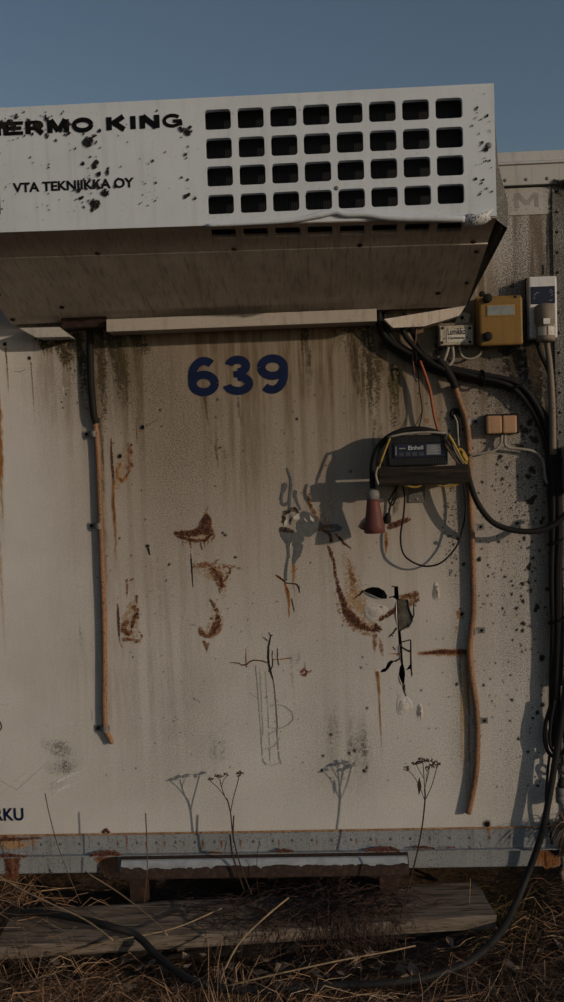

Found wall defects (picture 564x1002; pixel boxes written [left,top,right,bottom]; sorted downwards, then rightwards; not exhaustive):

rust [110,439,134,560]
rust [117,578,144,647]
rust [174,507,242,652]
rust [307,493,419,655]
rust [0,835,42,881]
rust [90,835,128,877]